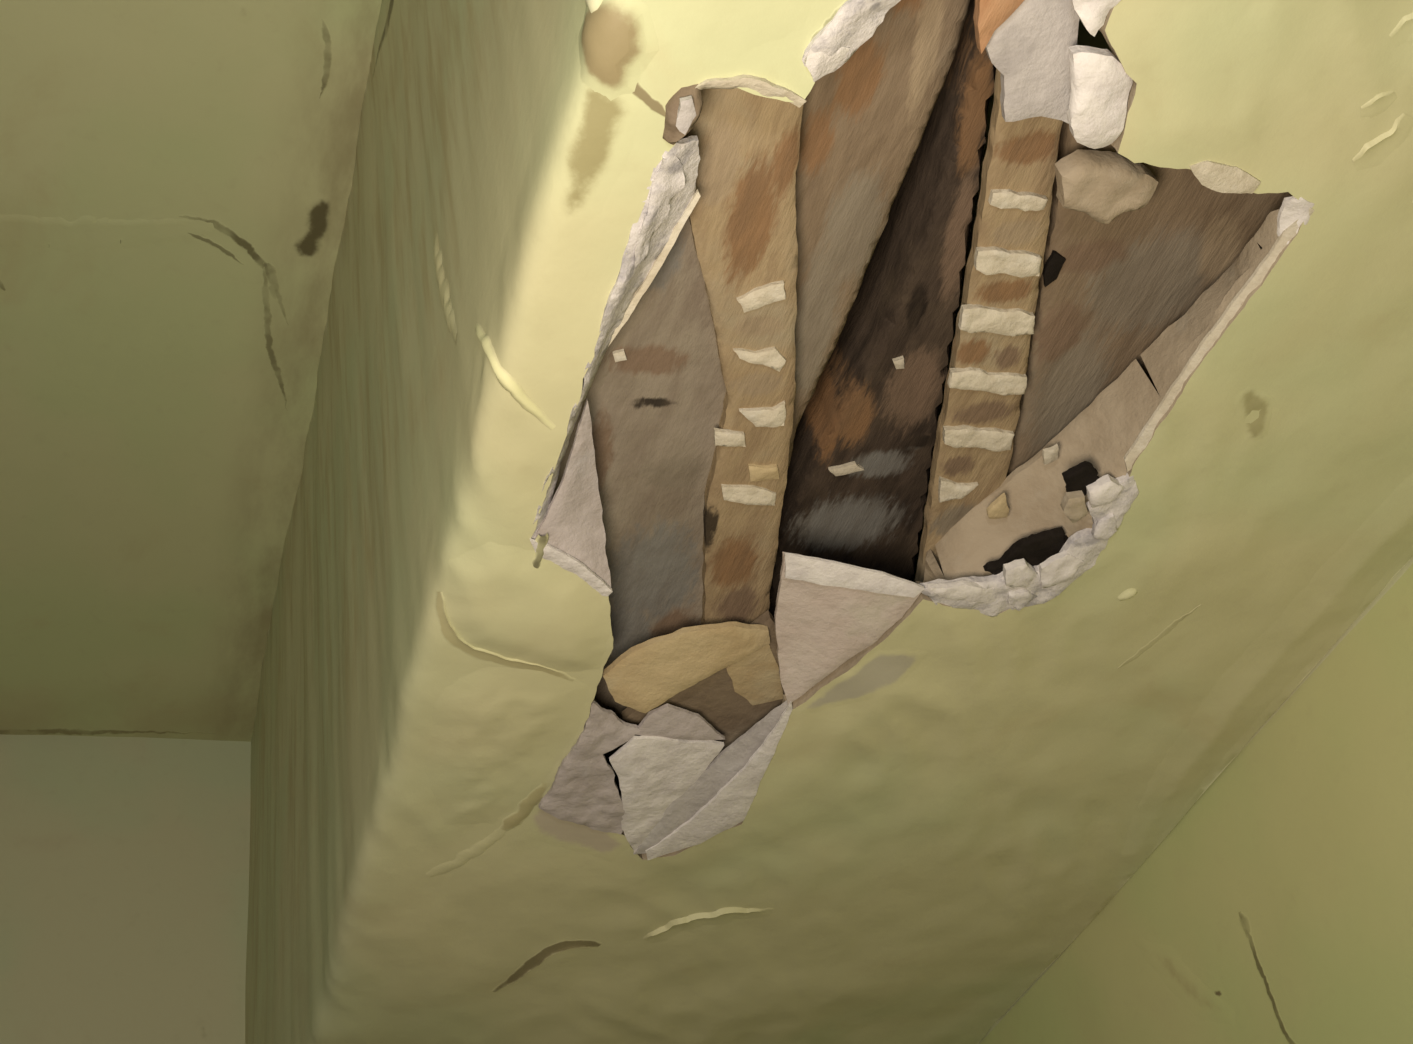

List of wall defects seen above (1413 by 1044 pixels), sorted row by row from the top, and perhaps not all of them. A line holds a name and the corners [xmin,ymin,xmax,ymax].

crack [319,19,333,99]
crack [372,0,395,80]
peeling [585,0,603,13]
peeling [802,0,901,82]
spalling [1067,0,1137,152]
spalling [1190,160,1261,194]
crack [179,214,289,411]
spalling [531,74,806,539]
spalling [782,196,1315,713]
peeling [492,939,602,992]
crack [1238,911,1297,1044]